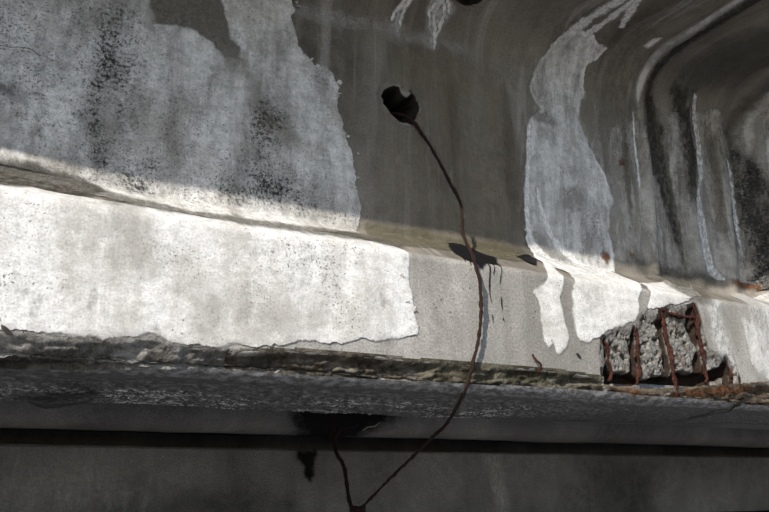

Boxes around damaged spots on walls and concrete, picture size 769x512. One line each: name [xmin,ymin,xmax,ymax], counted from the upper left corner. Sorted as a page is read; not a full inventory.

leakage [43,0,400,246]
peeling [0,0,769,406]
leakage [448,243,504,321]
leakage [391,0,769,291]
crack [671,396,752,423]